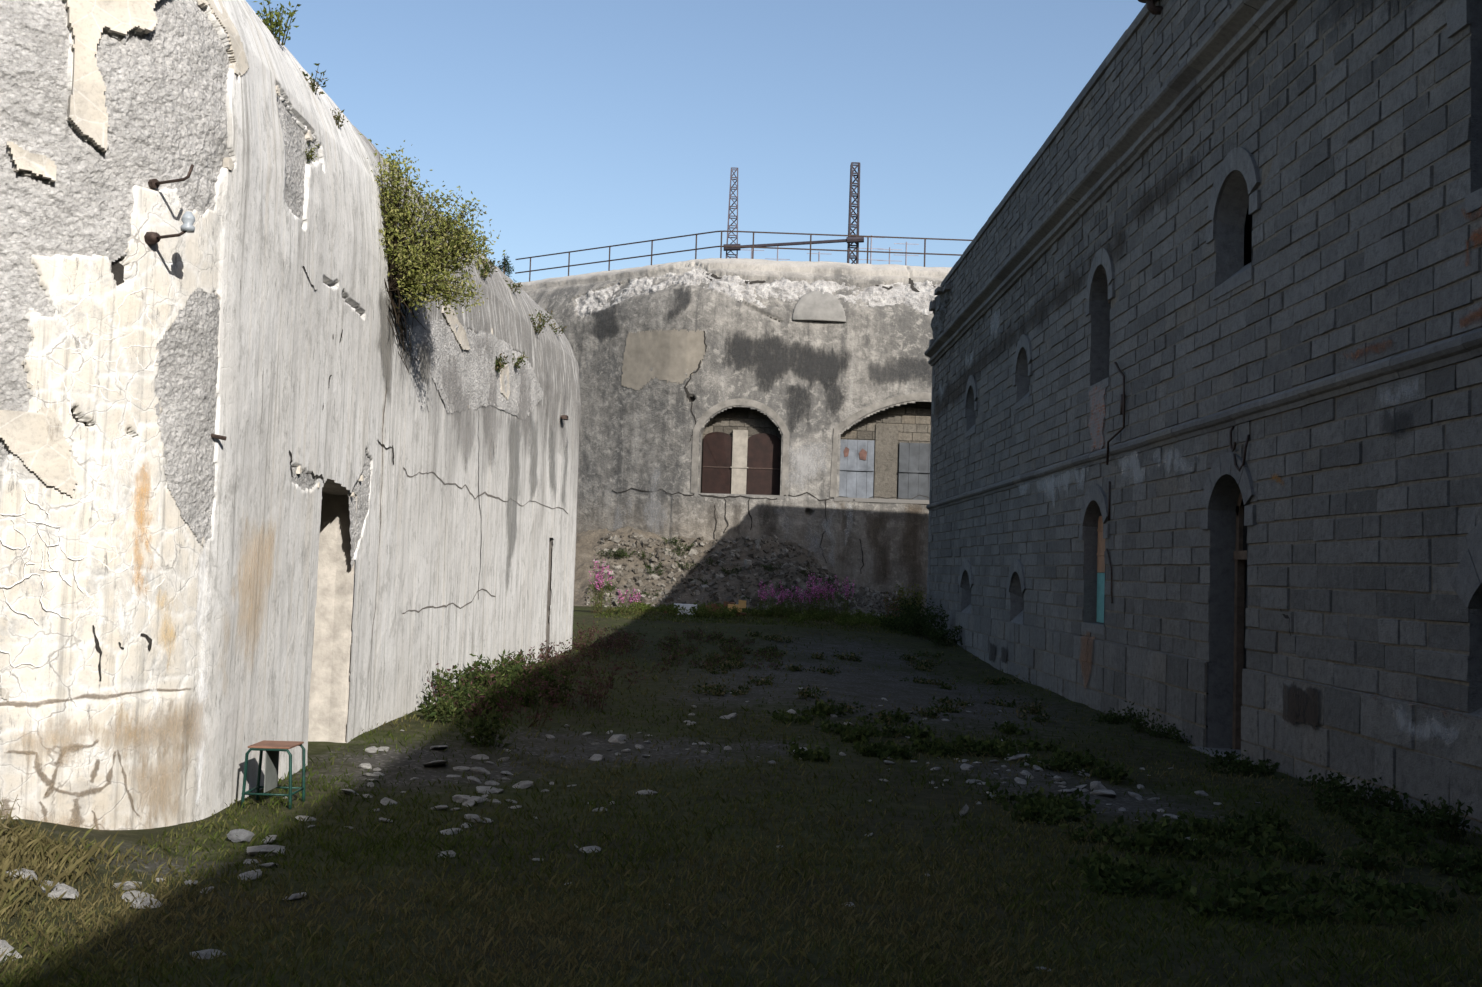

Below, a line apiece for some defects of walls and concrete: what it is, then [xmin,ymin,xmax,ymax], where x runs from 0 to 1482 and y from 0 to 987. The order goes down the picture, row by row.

spalling [0,0,249,497]
spalling [154,287,221,546]
crack [684,331,707,442]
water stain [723,333,850,430]
crack [0,256,185,707]
spalling [290,466,320,490]
spalling [347,454,371,567]
crack [369,388,568,669]
crack [612,488,929,572]